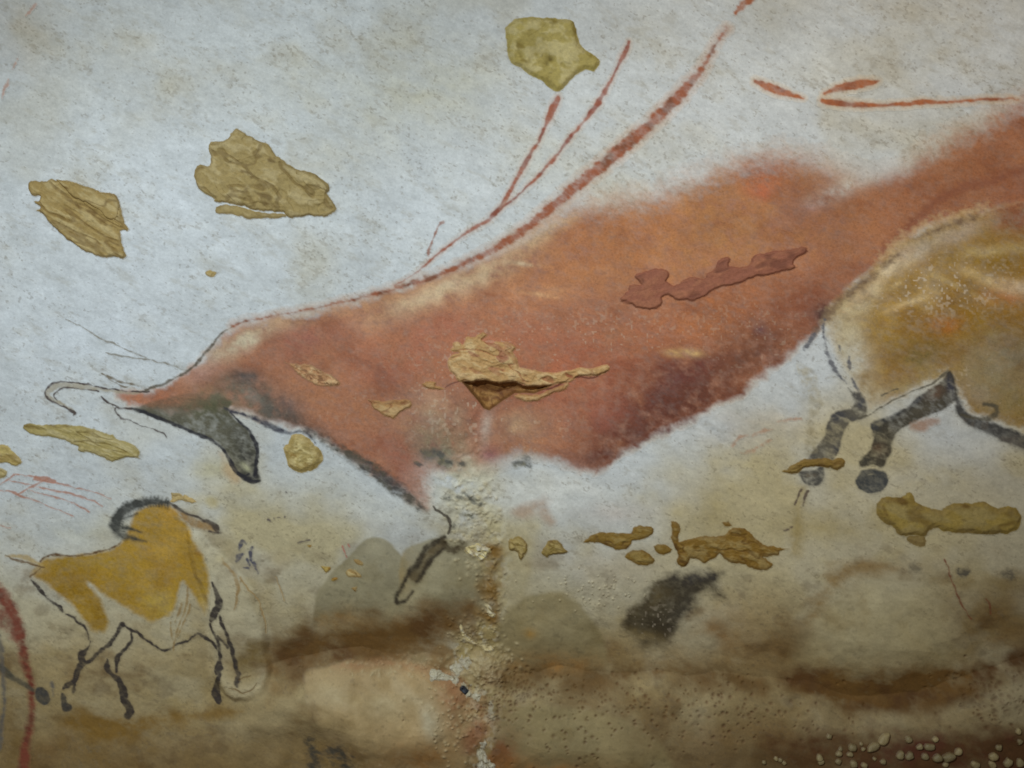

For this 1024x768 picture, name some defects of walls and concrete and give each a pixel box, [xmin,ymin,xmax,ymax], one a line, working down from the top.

peeling [504,16,601,93]
peeling [194,128,337,220]
peeling [28,178,130,260]
peeling [447,331,611,411]
peeling [22,422,140,462]
peeling [283,433,324,473]
water stain [464,543,492,562]
peeling [583,520,790,571]
peeling [875,492,1022,548]
water stain [484,604,496,618]
water stain [429,624,494,703]
water stain [476,738,496,768]